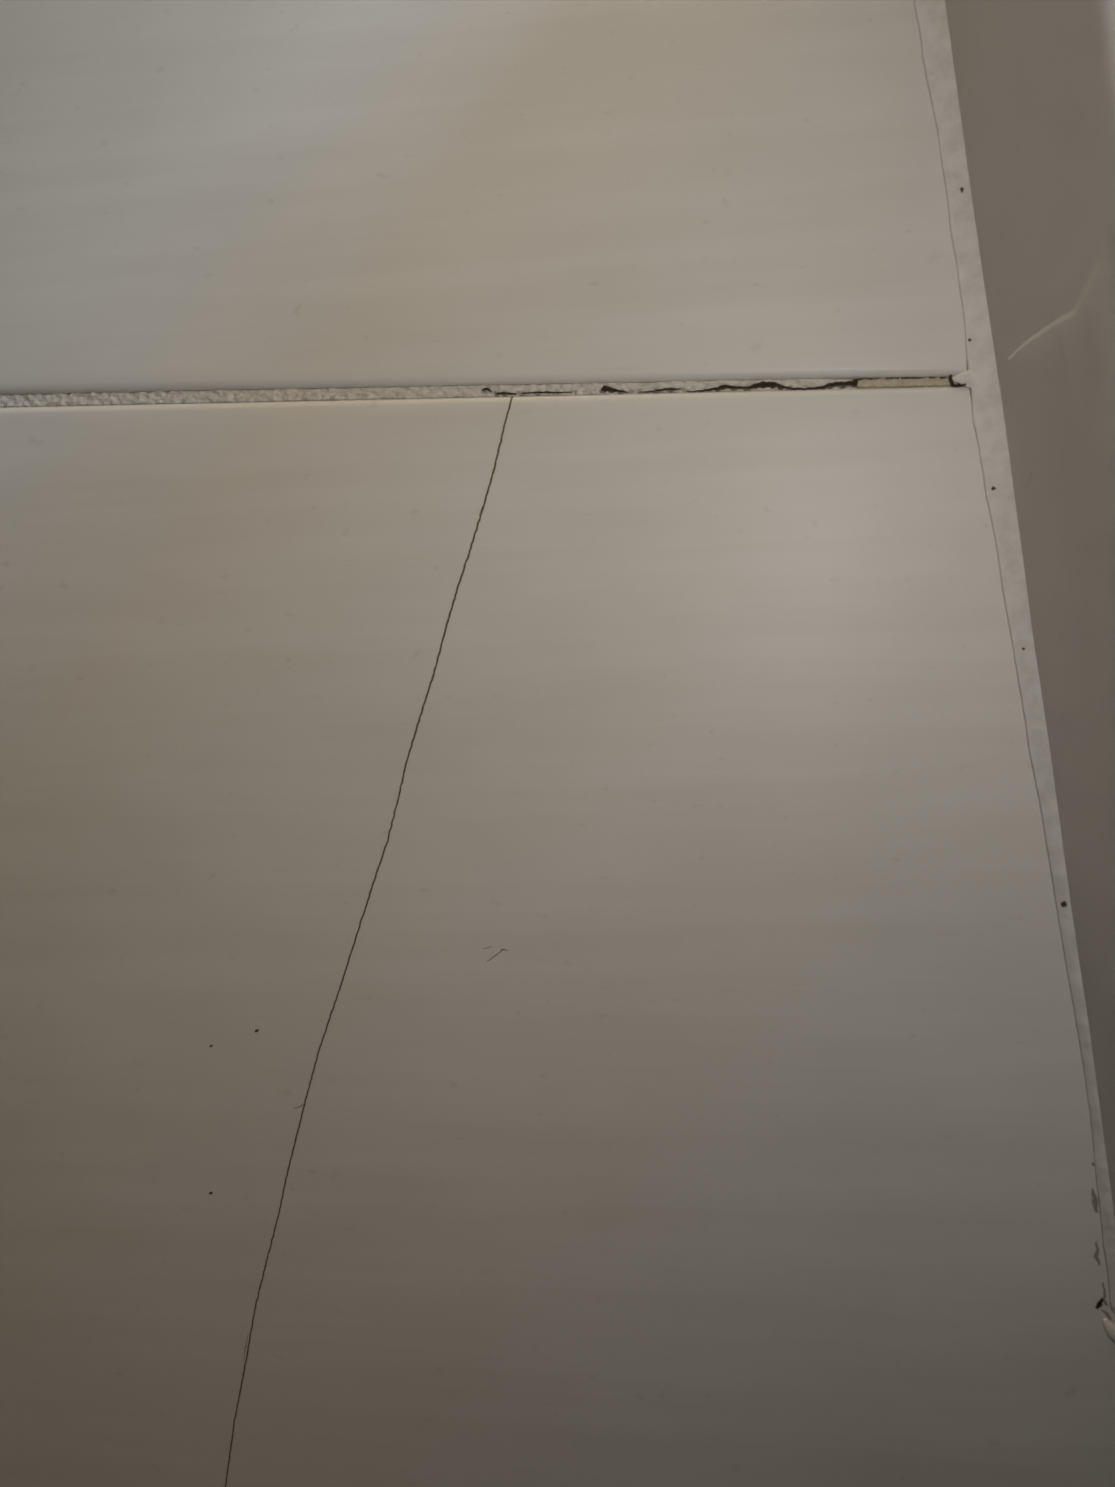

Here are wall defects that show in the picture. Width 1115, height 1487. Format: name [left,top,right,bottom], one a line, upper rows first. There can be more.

crack [225,379,862,1487]